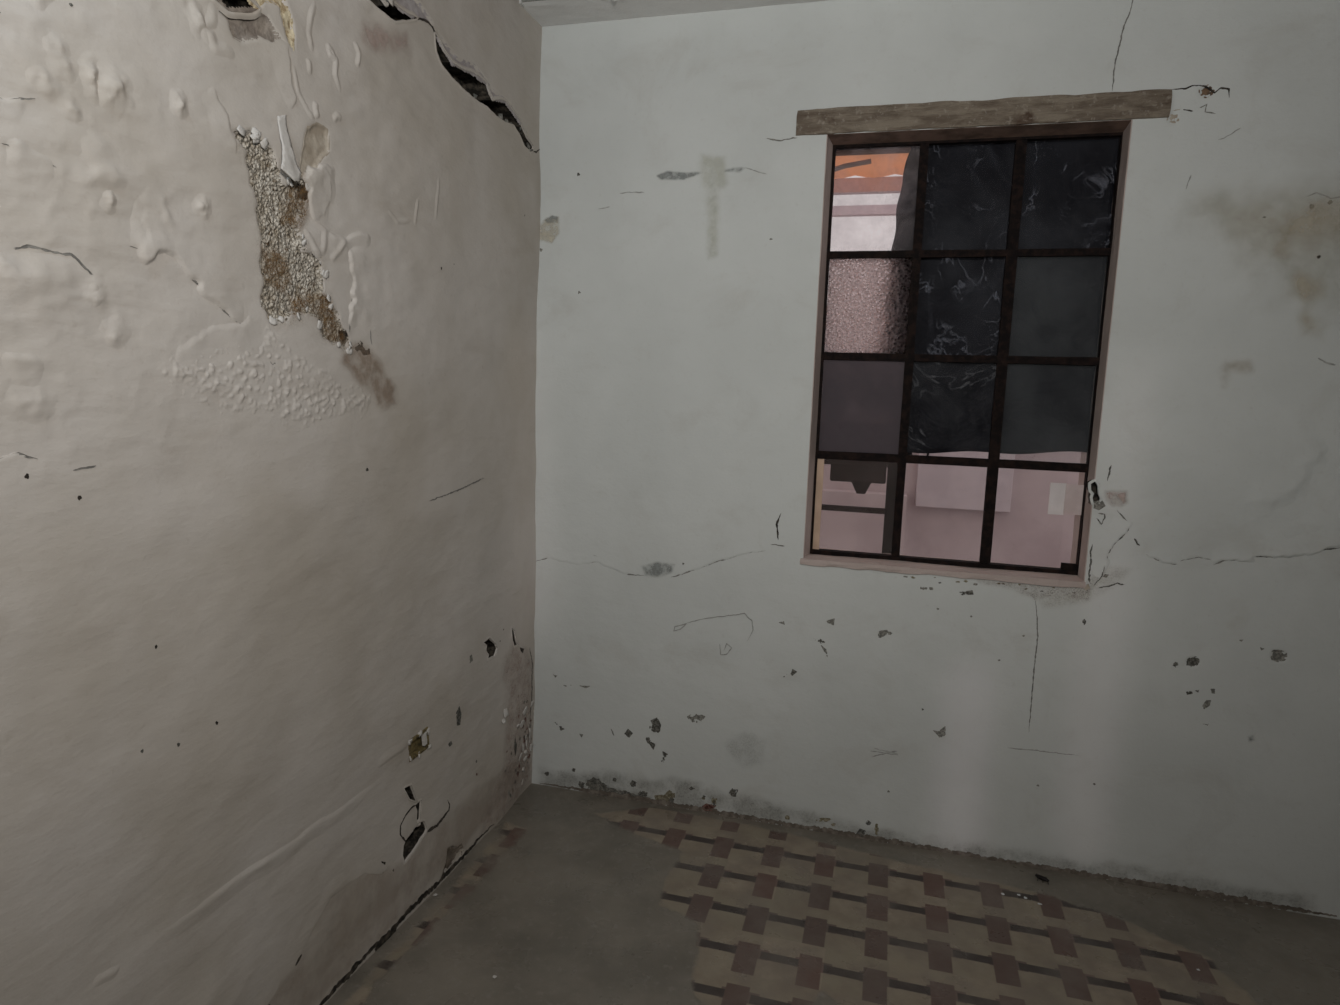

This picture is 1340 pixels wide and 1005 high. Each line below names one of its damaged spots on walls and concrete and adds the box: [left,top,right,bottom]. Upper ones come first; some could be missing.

spalling [25,31,84,123]
crack [367,0,540,155]
crack [1112,0,1133,90]
crack [1172,84,1230,114]
spalling [201,0,385,356]
crack [1086,466,1140,588]
crack [1029,601,1039,726]
spalling [1173,656,1200,667]
spalling [1260,647,1287,662]
peeling [611,718,668,762]
hole [381,783,450,872]